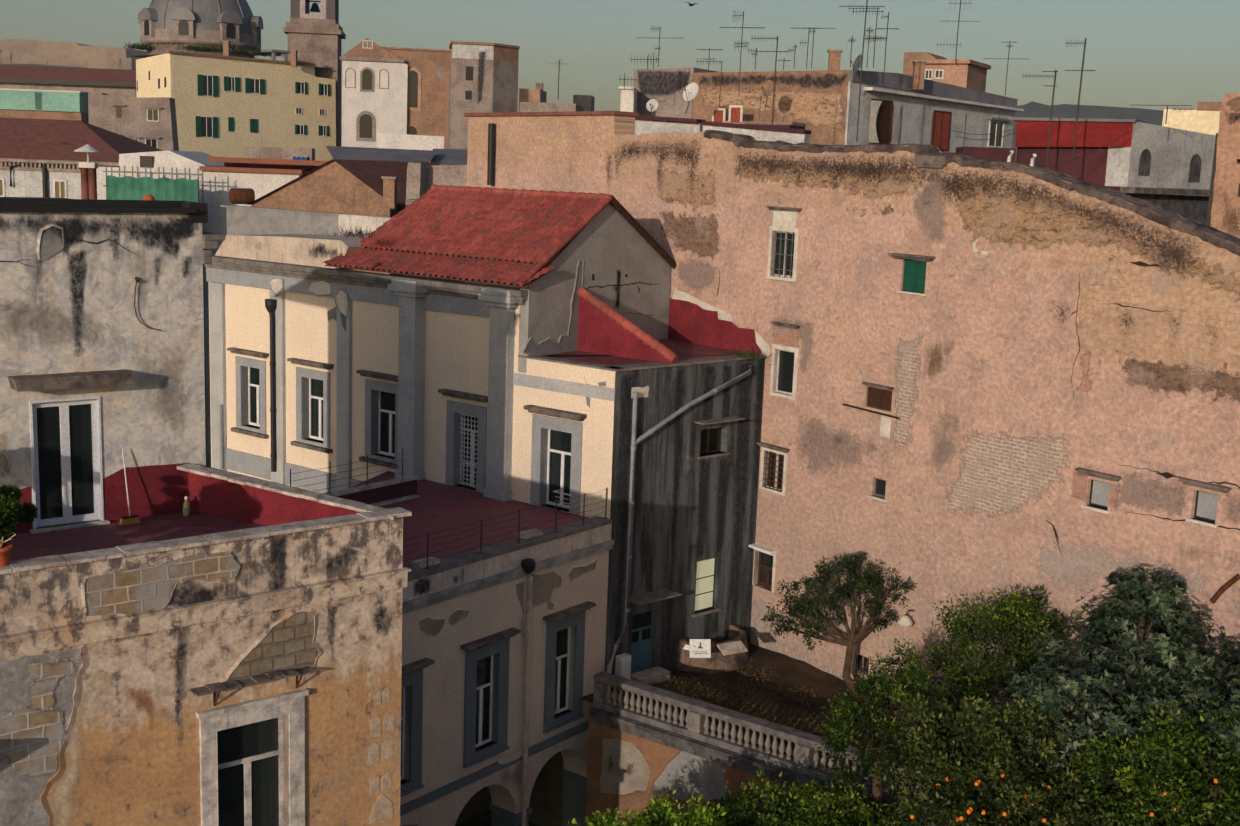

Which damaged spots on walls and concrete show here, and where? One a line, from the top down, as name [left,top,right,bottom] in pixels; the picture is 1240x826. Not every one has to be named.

leakage [0,216,194,347]
flaking render [892,333,922,449]
crack [1121,465,1240,489]
crack [1124,512,1186,521]
leakage [270,536,286,591]
leakage [325,547,354,571]
leakage [172,587,213,606]
flaking render [218,606,324,683]
leakage [374,608,390,635]
flaking render [418,608,470,637]
leakage [175,629,186,720]
flaking render [0,644,90,826]